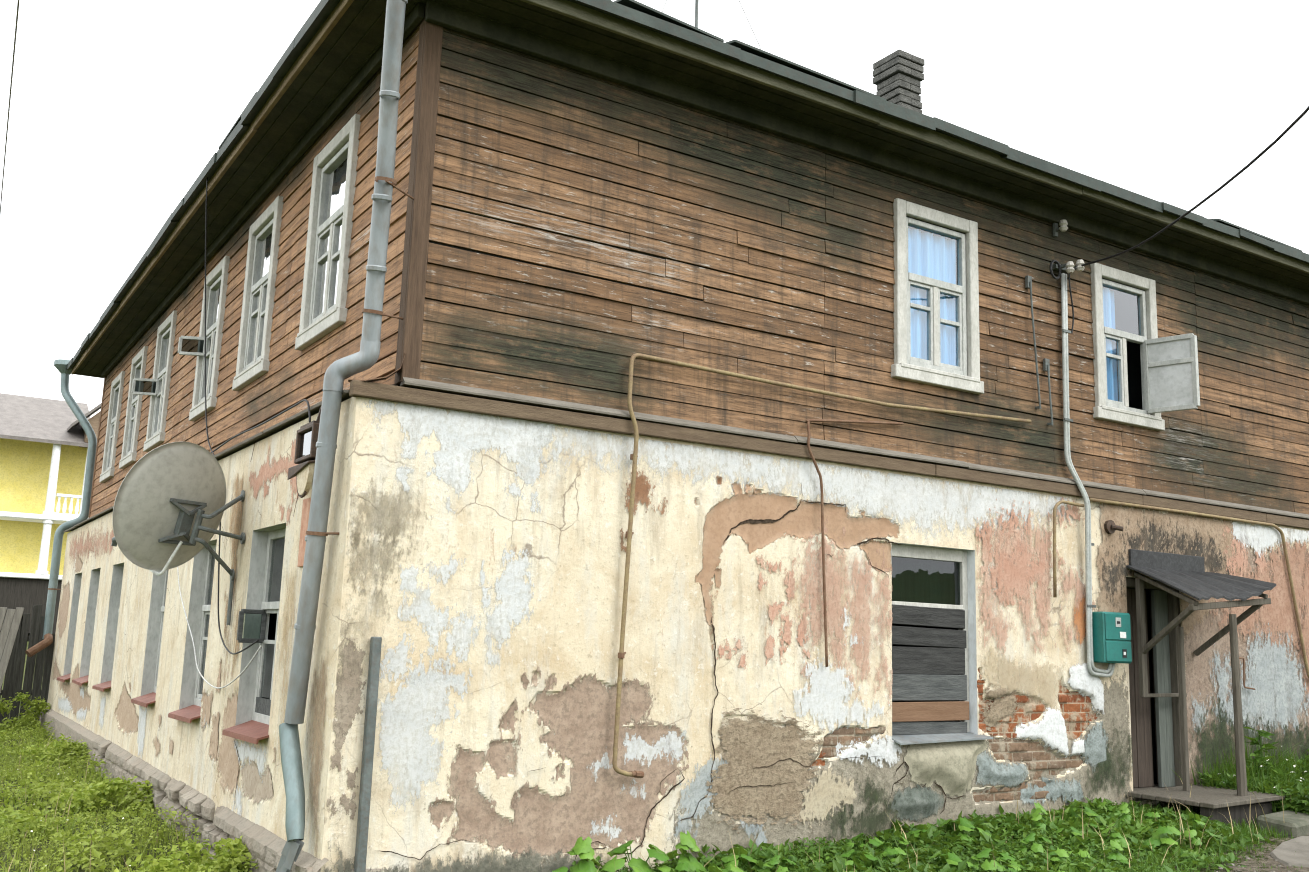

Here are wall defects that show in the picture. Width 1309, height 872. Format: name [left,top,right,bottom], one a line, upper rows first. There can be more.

peeling [58,525,114,639]
spalling [114,682,139,736]
spalling [200,660,276,805]
water stain [351,487,404,583]
water stain [307,629,581,872]
spalling [327,544,689,860]
crack [575,617,963,859]
crack [722,499,846,546]
spalling [695,476,902,834]
crack [827,538,900,577]
peeling [968,496,1104,807]
water stain [1100,520,1231,606]